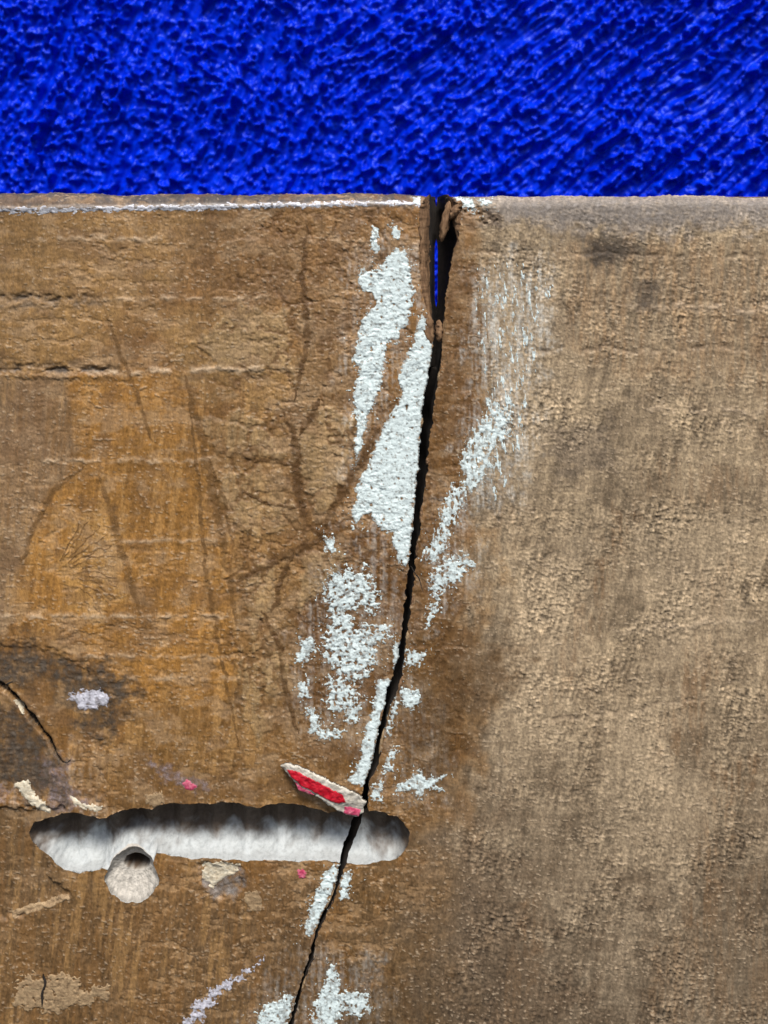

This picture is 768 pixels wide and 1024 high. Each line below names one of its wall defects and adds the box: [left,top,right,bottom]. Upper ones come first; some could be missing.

crack [288,194,463,1024]
crack [0,681,71,763]
peeling [70,796,103,812]
peeling [202,859,241,889]
peeling [244,890,262,911]
peeling [296,864,365,946]